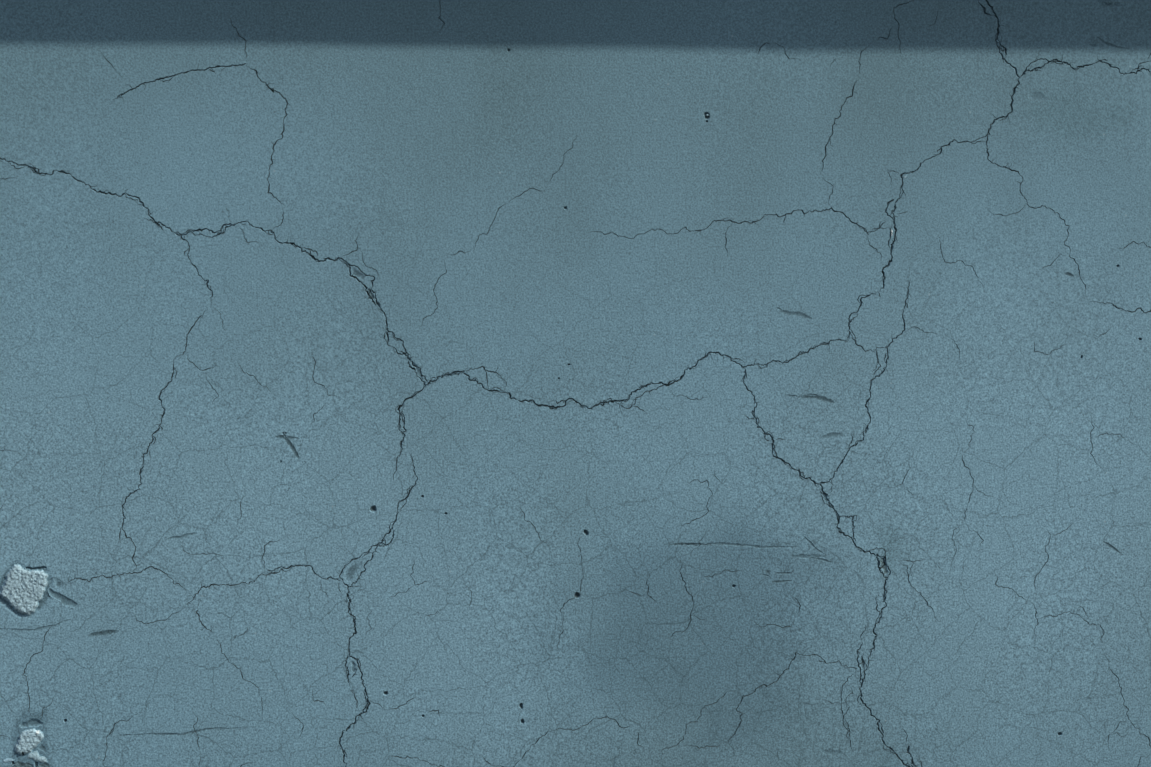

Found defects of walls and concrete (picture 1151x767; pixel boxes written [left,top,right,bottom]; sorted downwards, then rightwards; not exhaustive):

crack [644,0,1151,296]
crack [1098,302,1151,313]
crack [0,63,940,767]
crack [952,420,993,559]
crack [1090,416,1123,464]
crack [995,523,1151,767]
spalling [2,718,51,767]